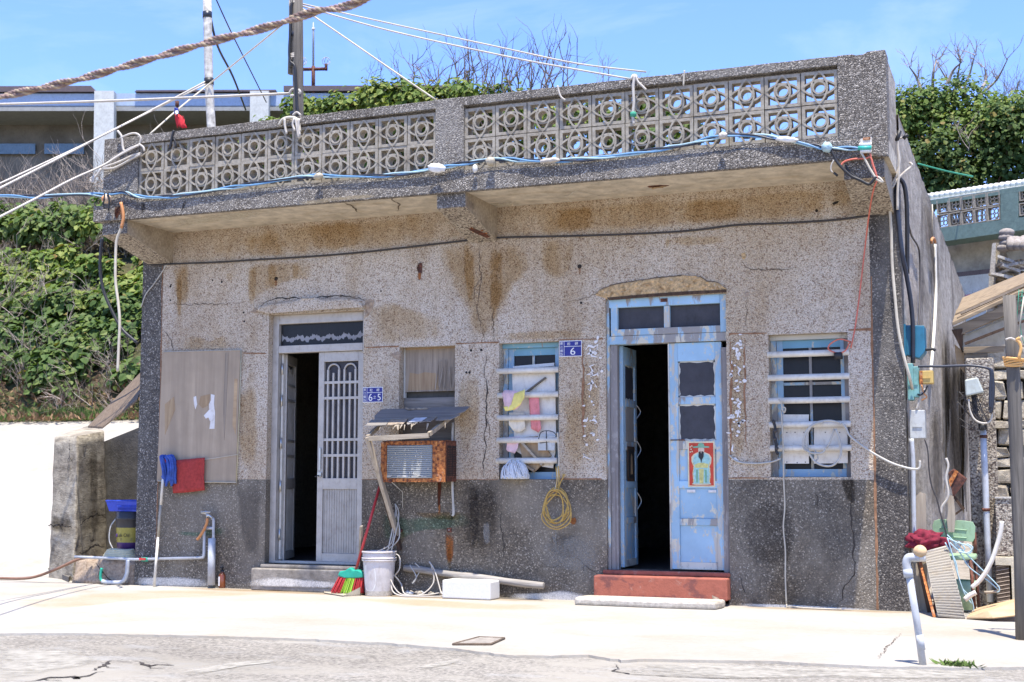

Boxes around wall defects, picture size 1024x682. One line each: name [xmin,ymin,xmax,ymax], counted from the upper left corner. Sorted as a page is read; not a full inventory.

crack [474,246,495,475]
peeling [726,334,747,461]
crack [838,484,856,603]